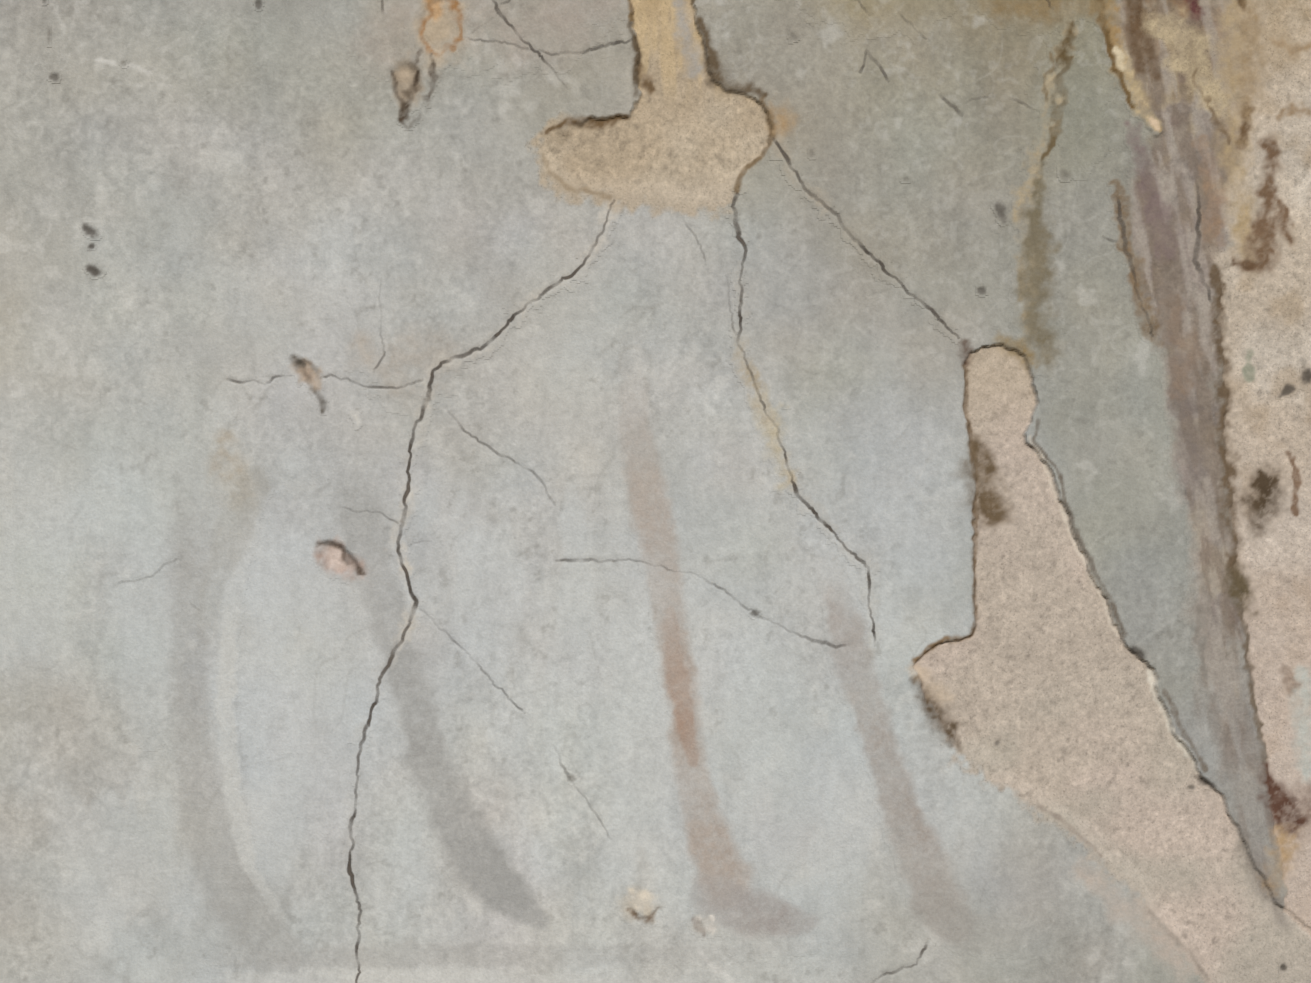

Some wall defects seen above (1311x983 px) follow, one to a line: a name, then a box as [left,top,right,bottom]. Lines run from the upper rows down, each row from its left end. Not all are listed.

peeling [388,0,471,131]
crack [495,3,543,59]
flaking render [524,0,816,222]
crack [760,127,961,344]
peeling [286,354,330,416]
peeling [311,533,375,589]
crack [341,187,624,983]
crack [726,181,883,657]
flaking render [902,0,1311,983]